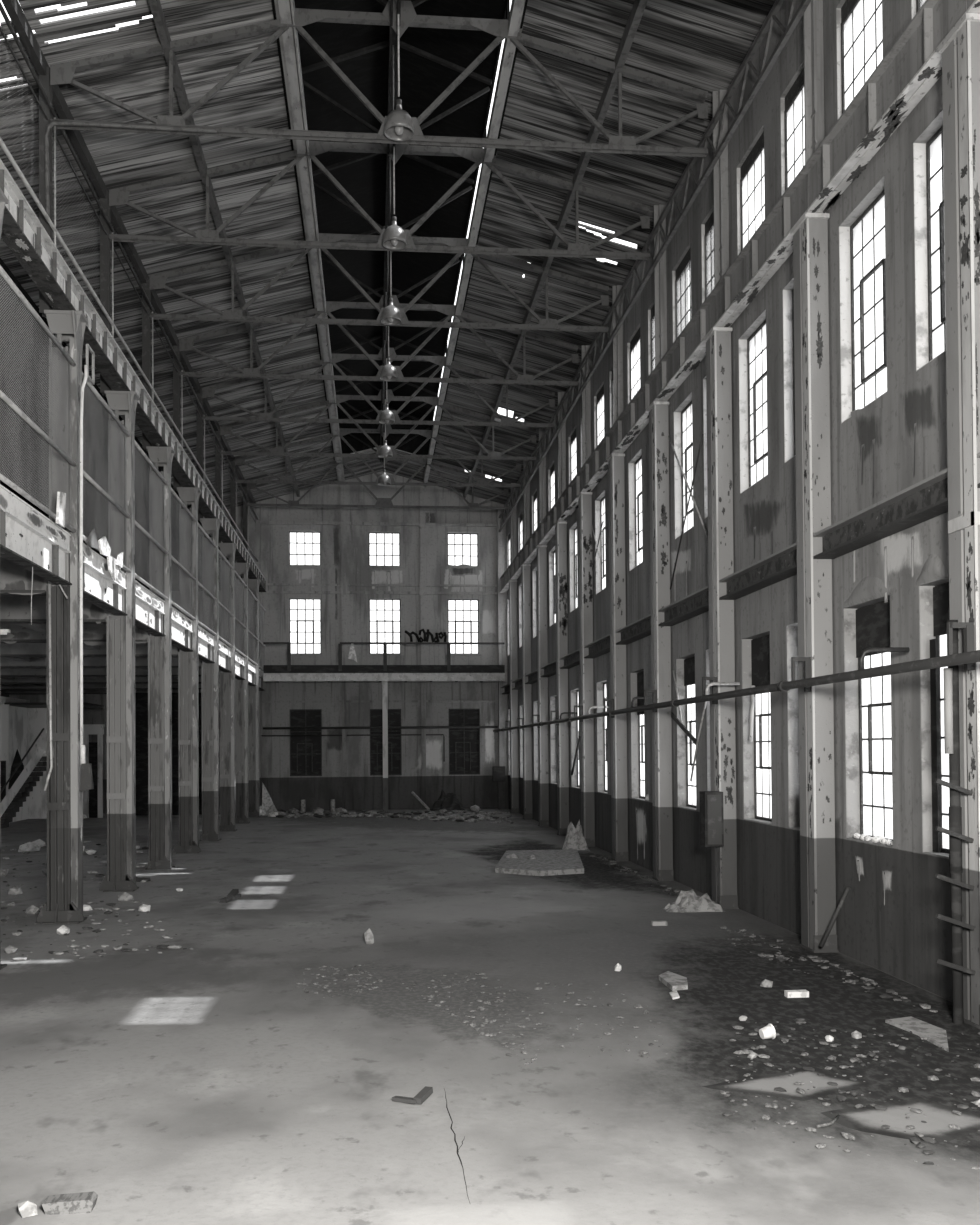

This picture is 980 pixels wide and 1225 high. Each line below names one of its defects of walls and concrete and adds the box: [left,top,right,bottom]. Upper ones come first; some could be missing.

peeling [918,66,942,81]
peeling [766,94,908,292]
peeling [960,129,980,304]
peeling [733,280,760,305]
peeling [0,492,243,680]
peeling [966,531,974,622]
peeling [967,670,976,791]
crack [444,1089,470,1203]